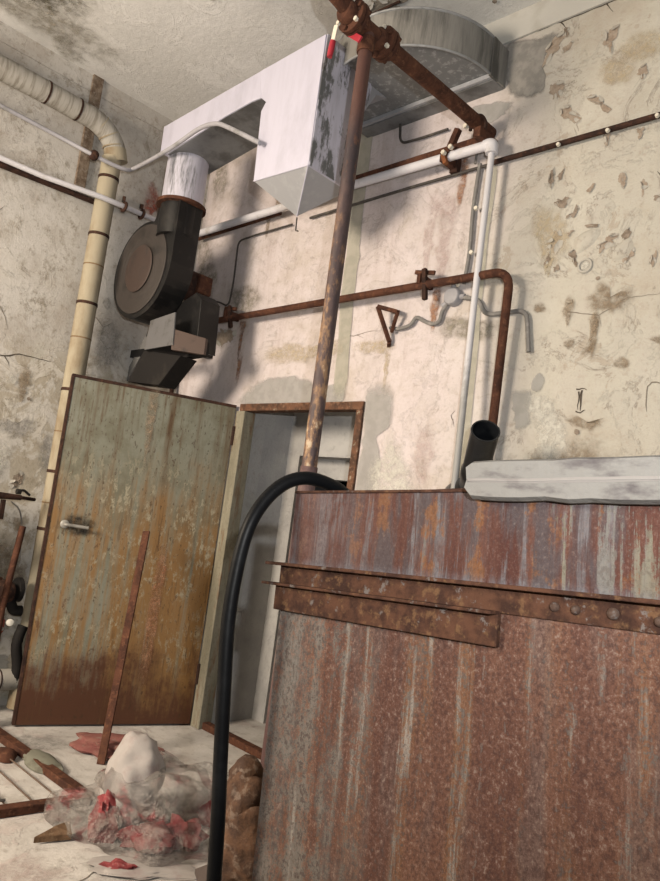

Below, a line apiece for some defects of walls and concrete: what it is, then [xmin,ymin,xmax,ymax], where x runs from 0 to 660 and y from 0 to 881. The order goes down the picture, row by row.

crack [0,353,51,364]
leakage [529,396,599,459]